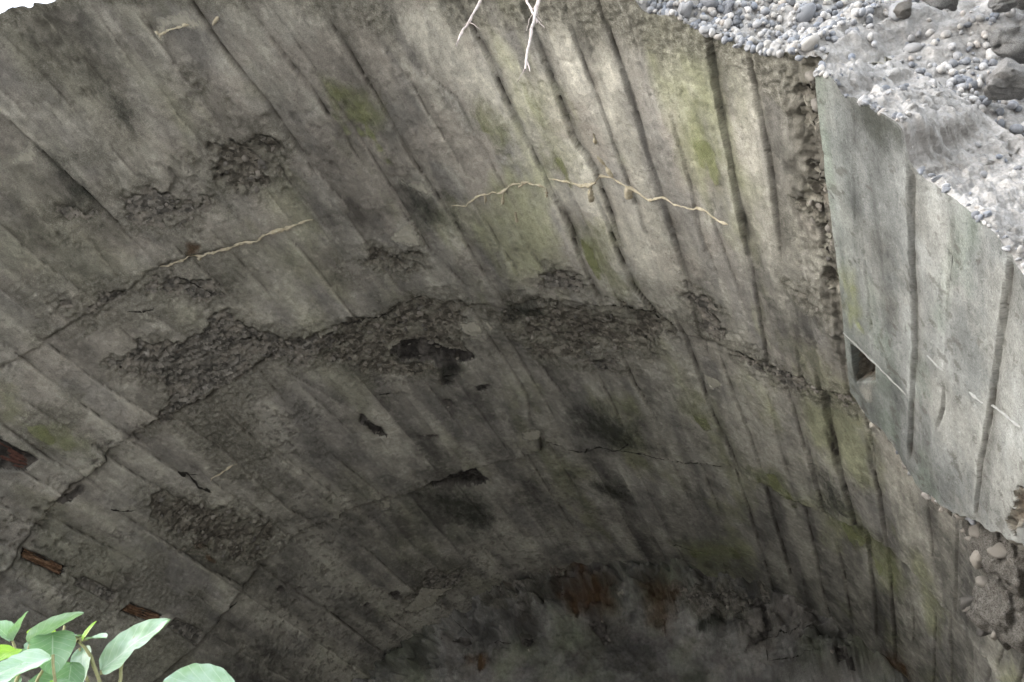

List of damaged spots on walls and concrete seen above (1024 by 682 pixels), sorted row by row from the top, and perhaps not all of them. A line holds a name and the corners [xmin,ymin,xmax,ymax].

spalling [208,135,285,195]
spalling [794,54,1024,292]
spalling [119,187,213,230]
spalling [364,247,425,274]
spalling [102,275,475,425]
spalling [486,270,677,372]
spalling [359,413,387,438]
spalling [424,468,489,488]
crack [550,442,721,467]
spalling [150,489,275,564]